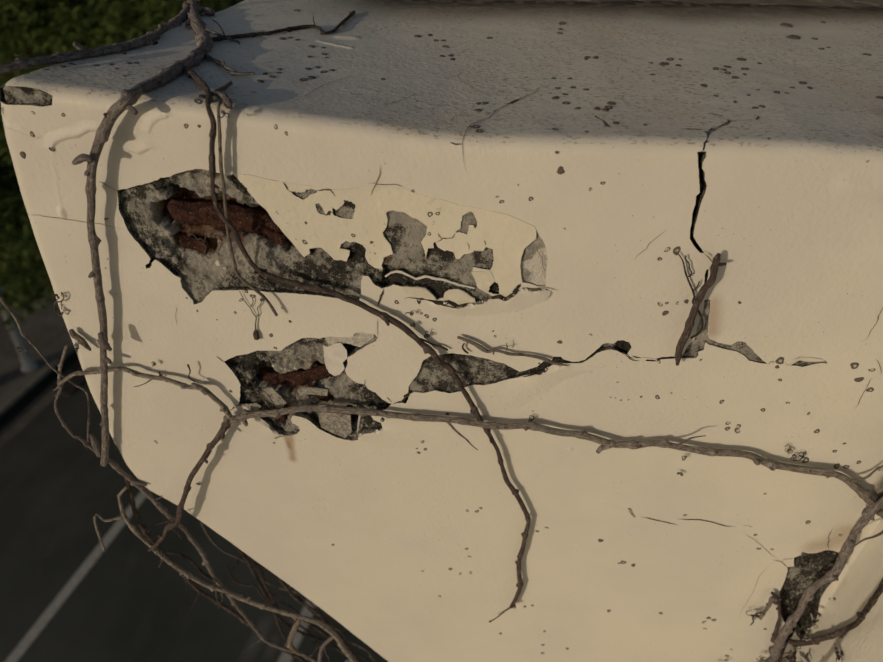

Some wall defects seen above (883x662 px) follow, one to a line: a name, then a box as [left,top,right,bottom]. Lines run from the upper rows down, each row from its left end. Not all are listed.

spalling [0,84,53,107]
spalling [117,169,547,305]
crack [690,151,713,283]
spalling [224,333,391,441]
peeling [402,299,767,404]
spalling [780,550,840,652]